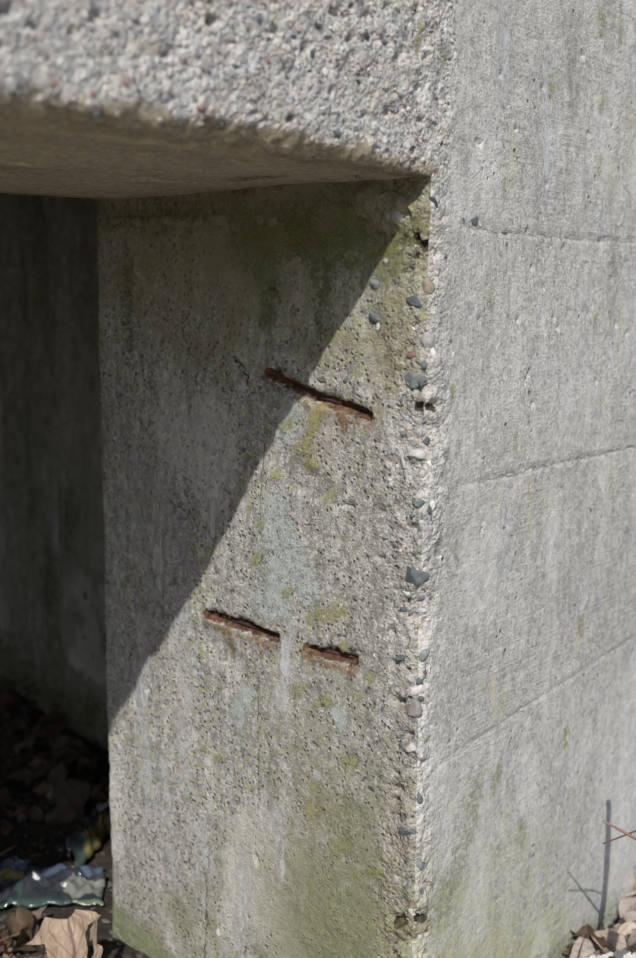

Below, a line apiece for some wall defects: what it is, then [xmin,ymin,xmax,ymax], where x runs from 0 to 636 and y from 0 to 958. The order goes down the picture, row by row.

water stain [268,626,294,730]